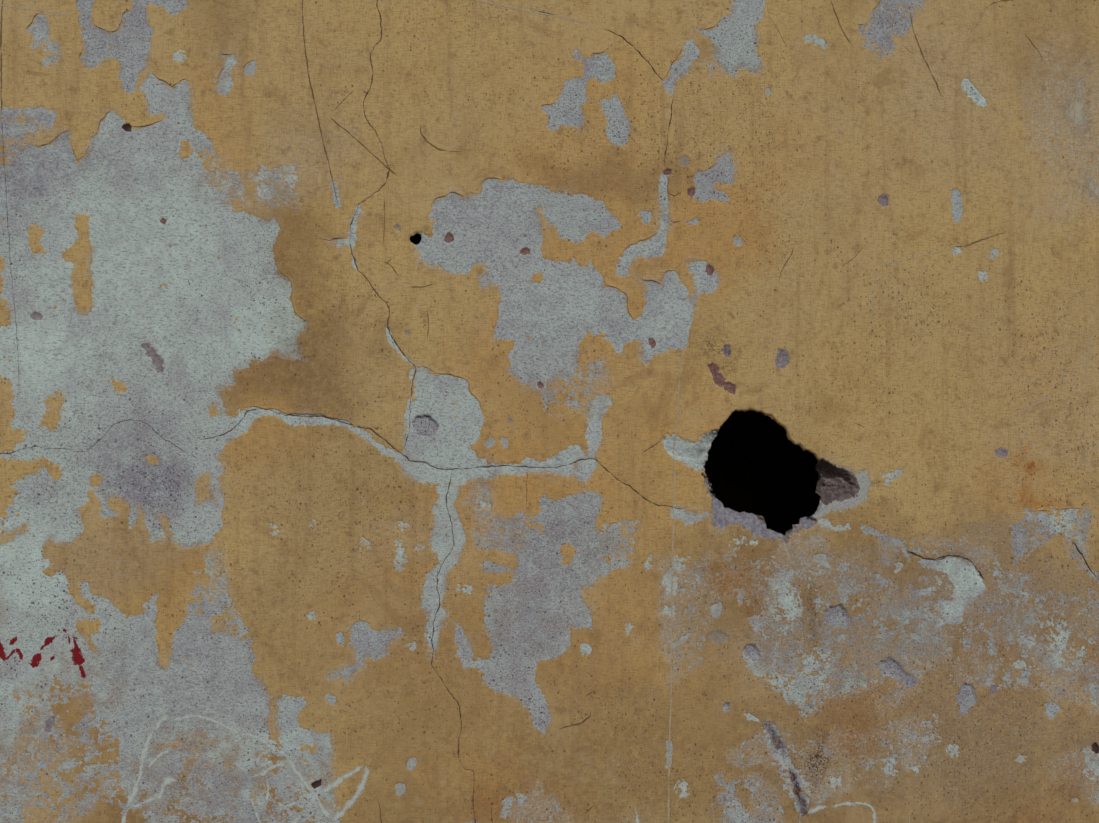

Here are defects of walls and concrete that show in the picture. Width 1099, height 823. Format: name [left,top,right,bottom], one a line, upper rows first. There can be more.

peeling [661,0,766,94]
spalling [803,34,828,50]
peeling [858,0,935,60]
crack [0,0,686,823]
peeling [0,0,736,823]
crack [907,551,984,579]
peeling [658,430,1099,823]